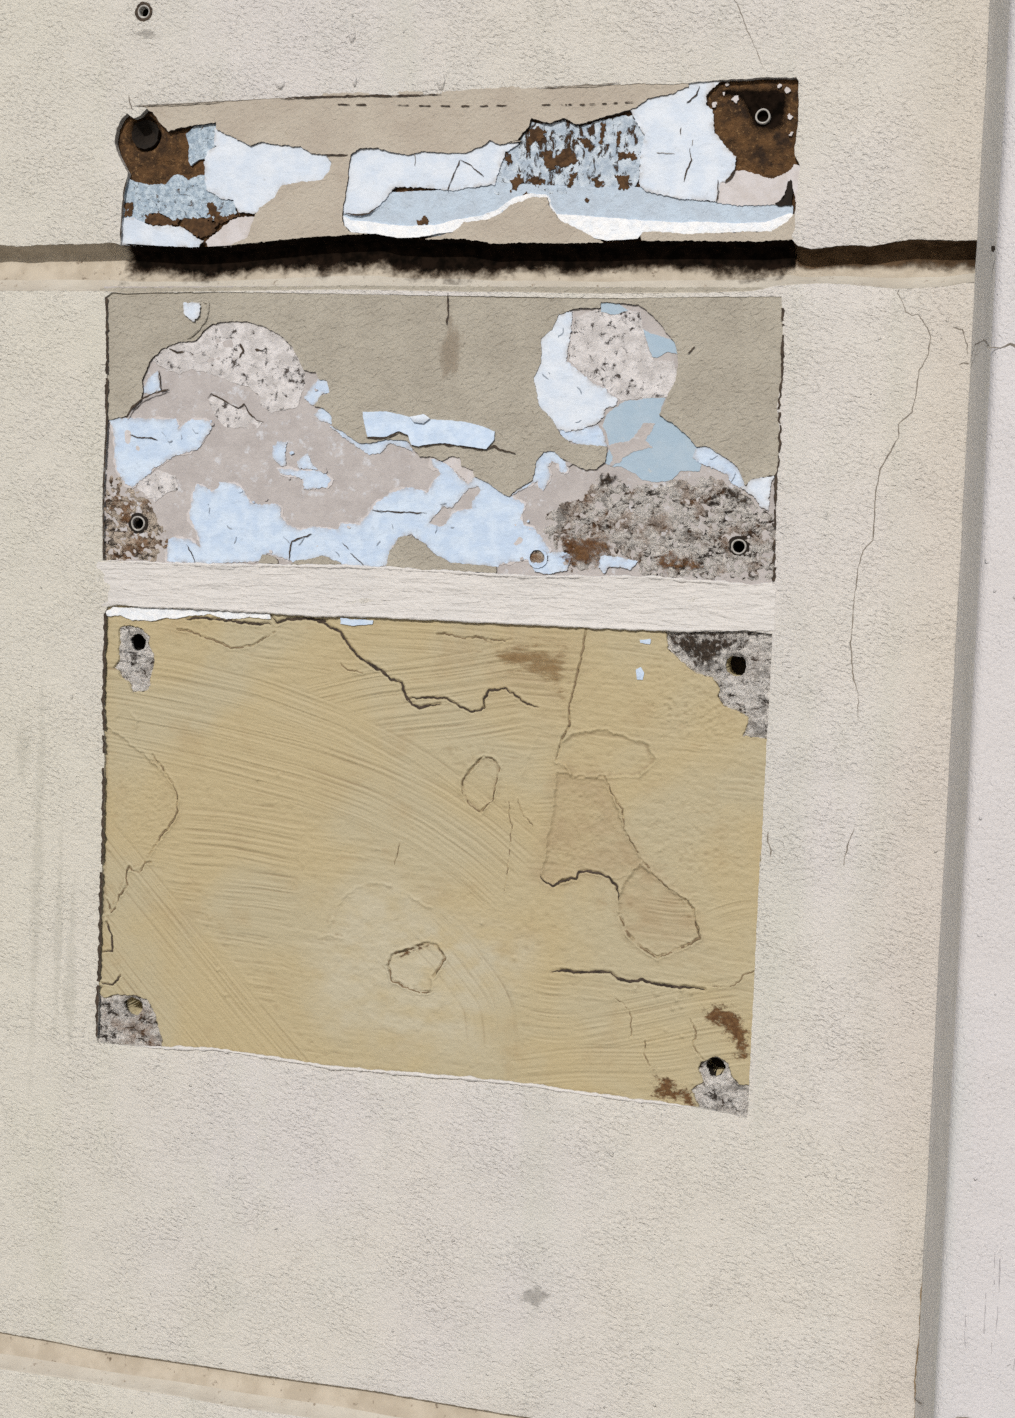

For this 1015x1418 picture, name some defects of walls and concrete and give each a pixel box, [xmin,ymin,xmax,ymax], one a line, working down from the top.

peeling [118,79,800,248]
peeling [100,285,785,585]
crack [849,290,1015,709]
crack [177,615,585,757]
crack [101,755,178,985]
crack [388,943,446,993]
peeling [95,605,772,1116]
crack [462,757,753,1066]
corrosion [651,1075,693,1106]
corrosion [705,1004,749,1059]